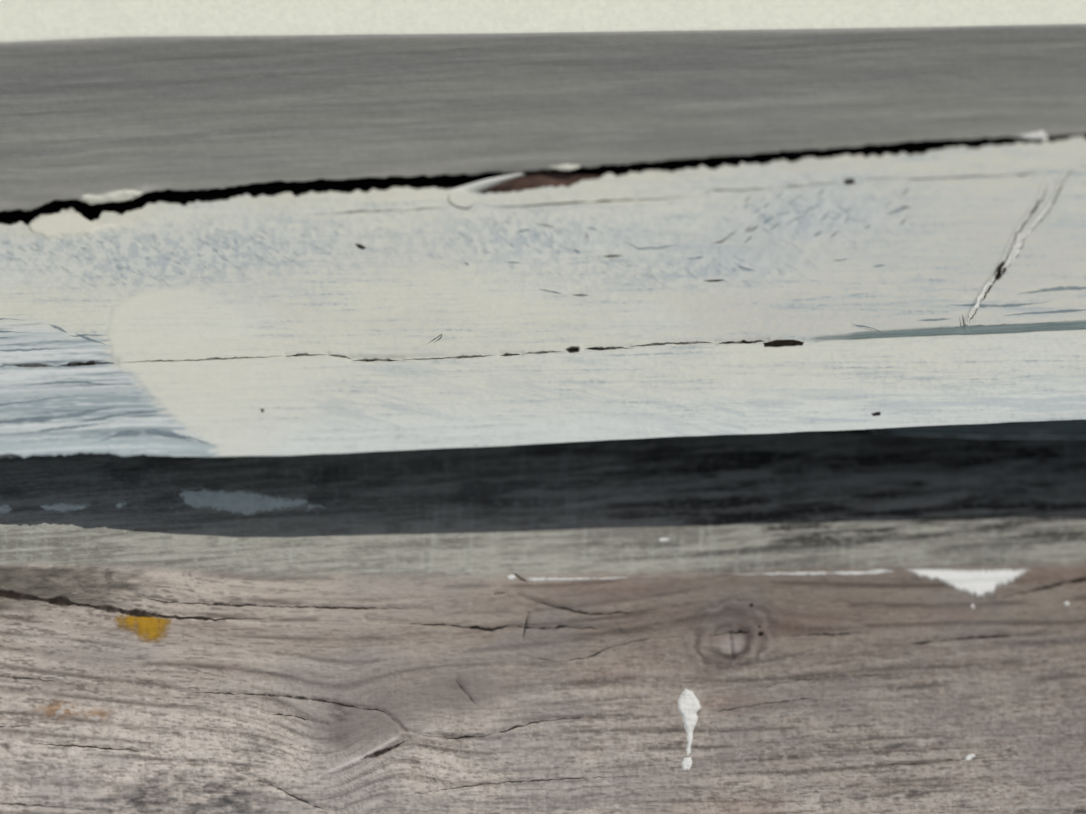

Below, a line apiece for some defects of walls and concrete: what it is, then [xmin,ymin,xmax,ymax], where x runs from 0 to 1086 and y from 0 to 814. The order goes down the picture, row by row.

crack [0,174,499,239]
crack [497,131,1086,326]
crack [2,340,763,367]
peeling [0,406,162,436]
peeling [100,429,210,444]